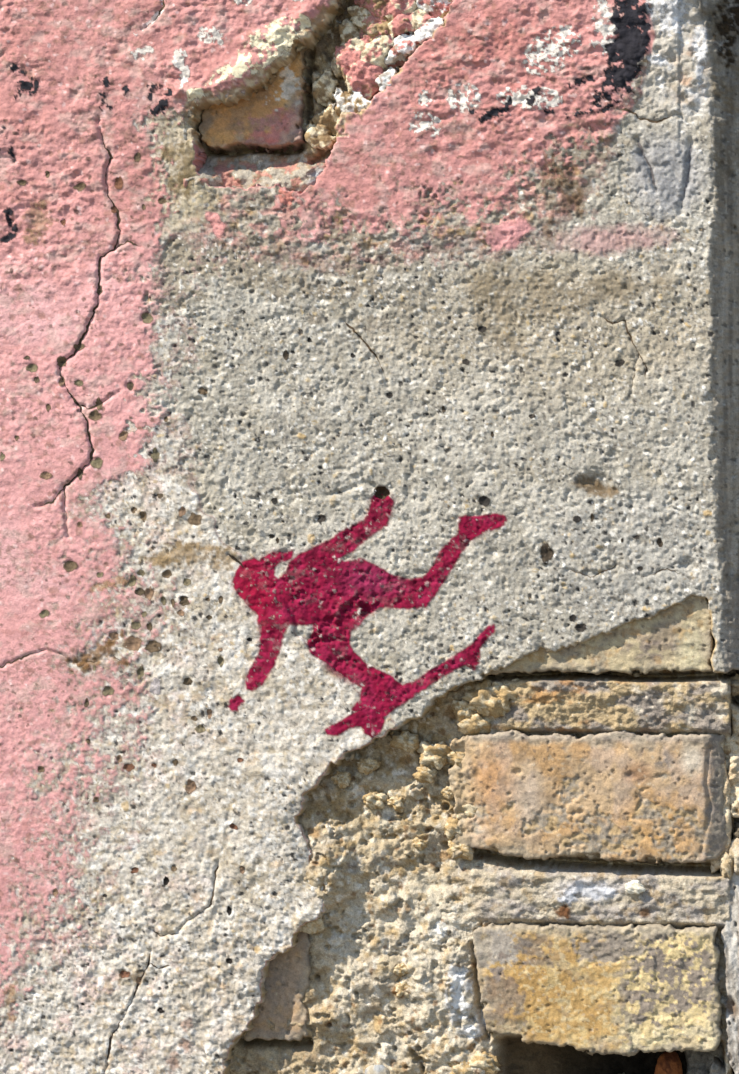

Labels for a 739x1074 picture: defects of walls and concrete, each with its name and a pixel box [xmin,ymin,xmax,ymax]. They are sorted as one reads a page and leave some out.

peeling [130,0,617,298]
peeling [616,54,649,116]
crack [37,122,140,532]
peeling [0,313,733,1074]
crack [104,866,219,1072]